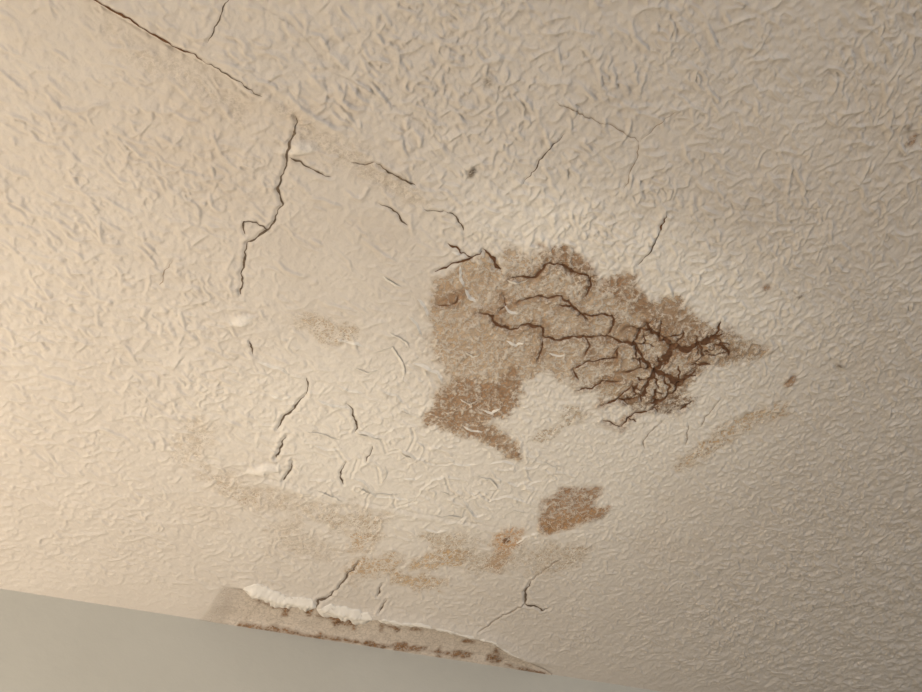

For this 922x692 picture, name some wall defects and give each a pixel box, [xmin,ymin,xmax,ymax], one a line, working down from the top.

crack [239,116,330,294]
crack [357,162,416,186]
crack [424,209,730,446]
damp [425,246,766,460]
crack [276,378,309,480]
damp [540,487,608,534]
crack [316,562,359,607]
peeling [213,583,552,675]
crack [479,560,560,632]